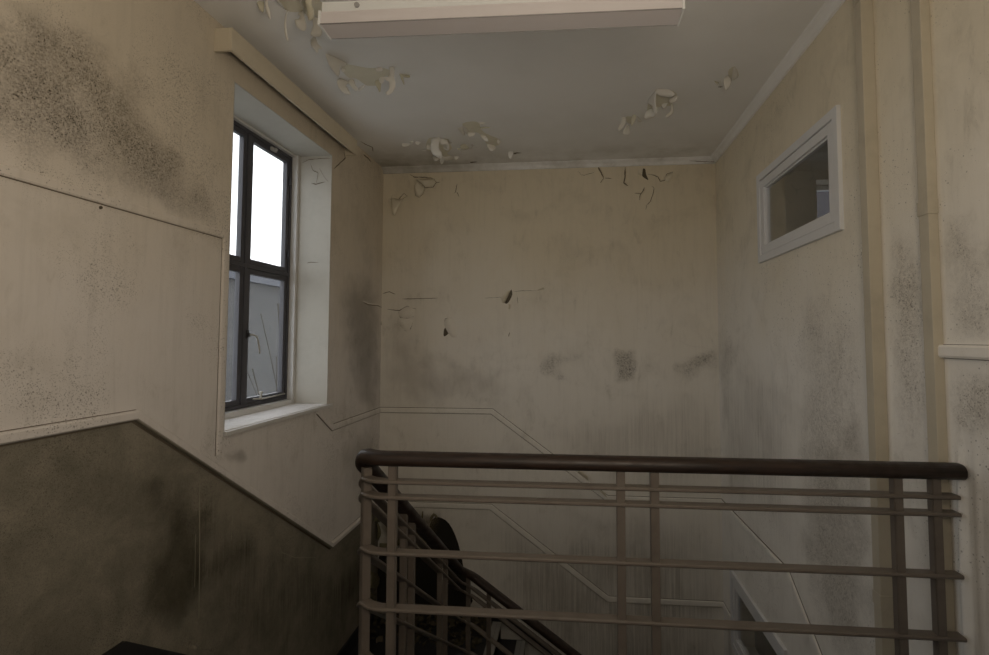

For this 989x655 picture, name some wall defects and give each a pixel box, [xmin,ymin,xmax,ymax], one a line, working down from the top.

peeling [257,0,322,53]
water stain [0,23,177,194]
peeling [401,137,459,164]
crack [578,167,655,210]